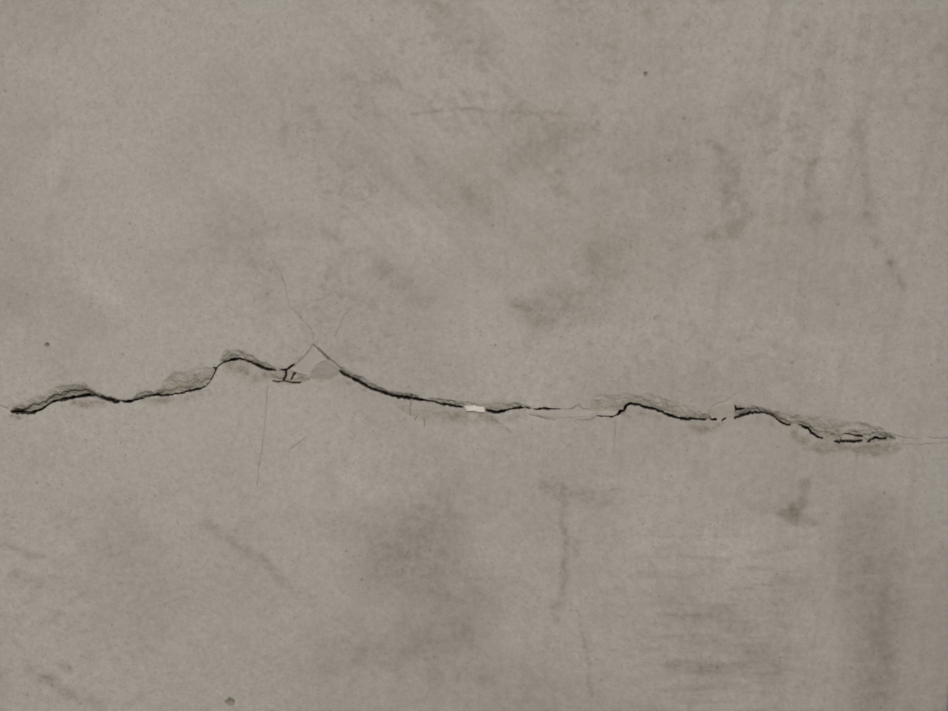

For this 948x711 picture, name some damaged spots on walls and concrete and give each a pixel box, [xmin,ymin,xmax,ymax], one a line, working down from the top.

crack [0,261,948,488]